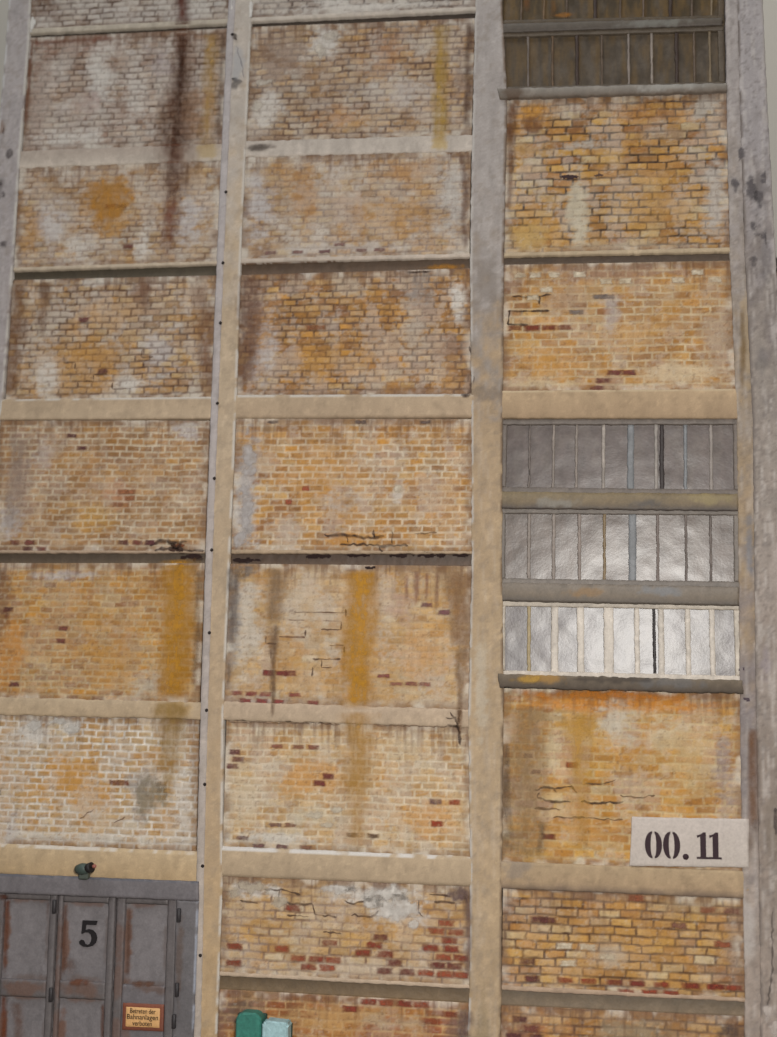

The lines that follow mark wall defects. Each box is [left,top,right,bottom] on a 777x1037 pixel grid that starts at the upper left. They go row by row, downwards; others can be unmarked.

rust [165,0,188,237]
crack [324,530,437,552]
crack [534,780,655,821]
peeling [323,884,468,978]